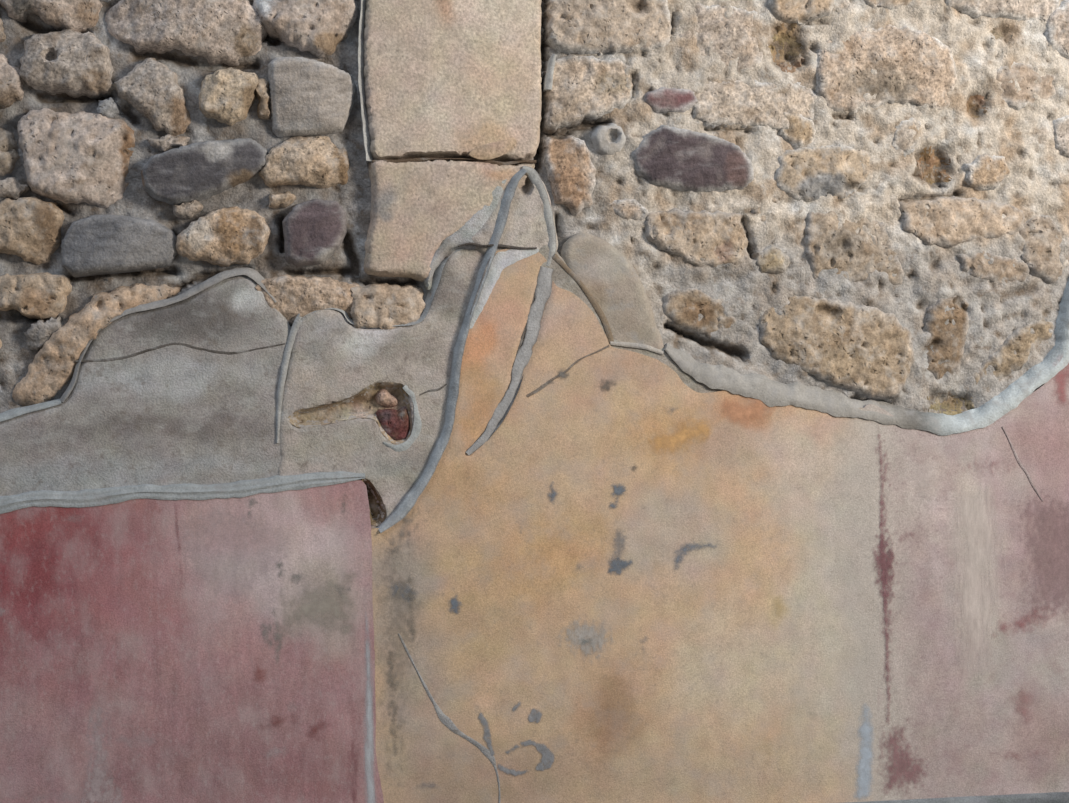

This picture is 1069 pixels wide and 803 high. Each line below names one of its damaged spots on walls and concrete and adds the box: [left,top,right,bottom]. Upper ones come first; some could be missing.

crack [75,343,285,362]
flaking render [0,172,723,529]
crack [458,242,610,456]
crack [398,633,554,803]